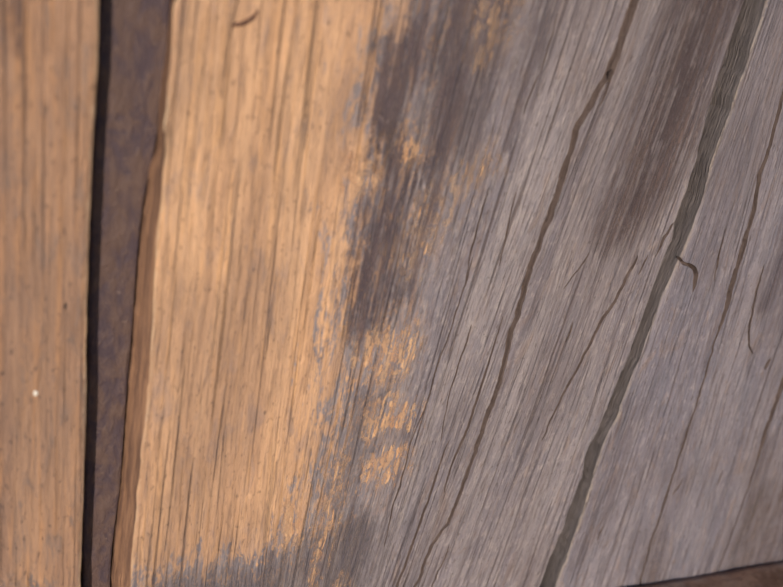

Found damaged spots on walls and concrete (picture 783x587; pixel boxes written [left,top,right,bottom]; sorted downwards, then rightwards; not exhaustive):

crack [221,0,238,99]
crack [384,0,639,587]
crack [541,90,783,586]